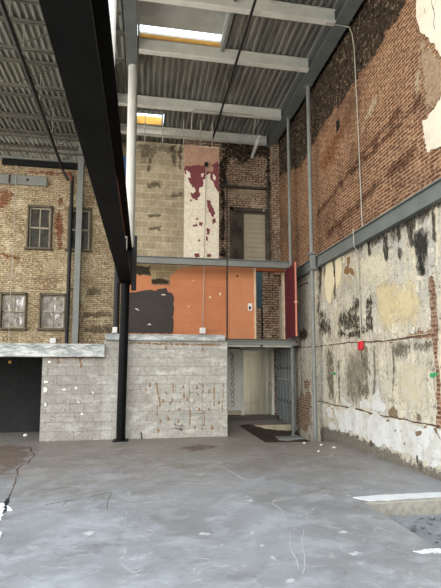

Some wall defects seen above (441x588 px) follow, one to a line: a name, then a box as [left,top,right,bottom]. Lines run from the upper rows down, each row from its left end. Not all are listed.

flaking render [416,0,441,56]
damp [317,71,421,215]
flaking render [422,98,441,153]
peeling [184,145,219,201]
peeling [193,200,216,242]
damp [328,184,376,237]
damp [431,207,441,266]
damp [317,220,425,340]
crack [295,329,431,349]
peeling [321,275,441,470]
corrosion [178,384,223,430]
crack [3,446,35,498]